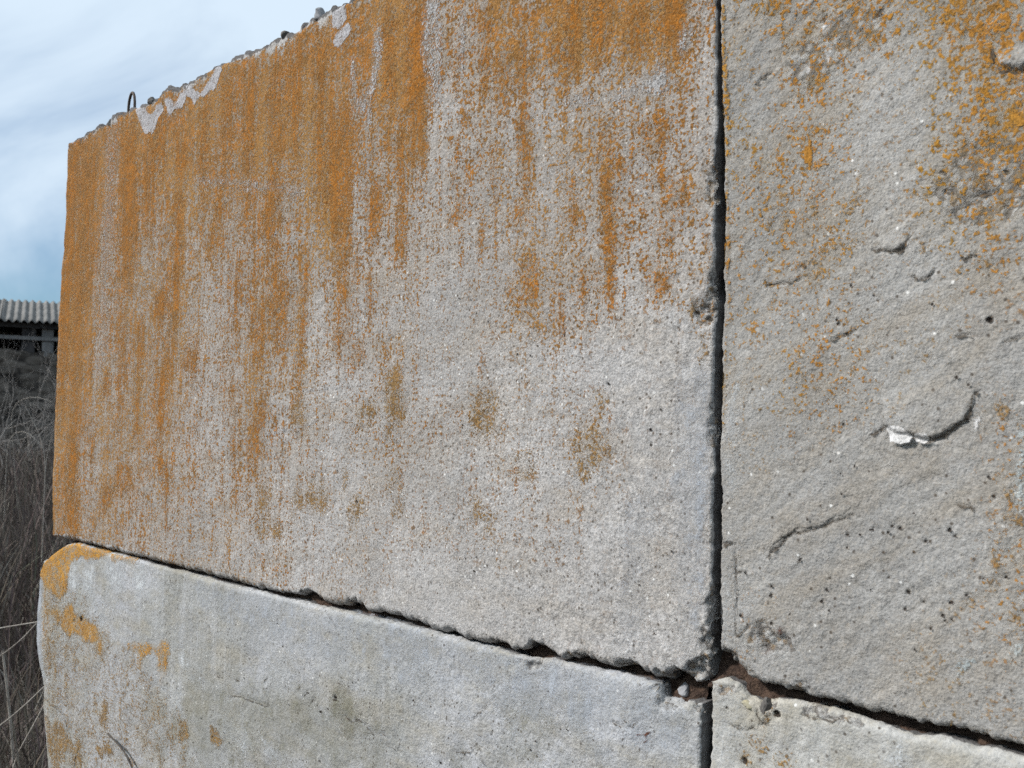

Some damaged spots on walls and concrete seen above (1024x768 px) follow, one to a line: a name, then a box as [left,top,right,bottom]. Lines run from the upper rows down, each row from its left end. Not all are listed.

peeling [332,5,352,47]
peeling [136,66,222,134]
corrosion [40,0,718,768]
peeling [886,426,930,444]
crack [928,392,979,443]
crack [768,514,852,557]